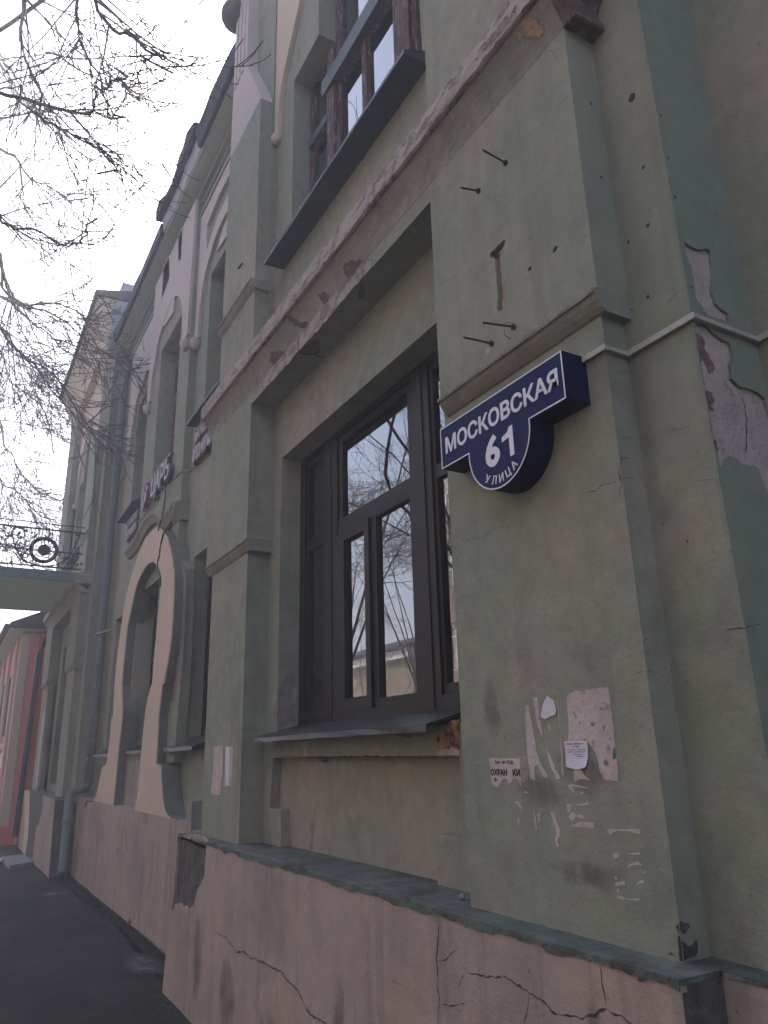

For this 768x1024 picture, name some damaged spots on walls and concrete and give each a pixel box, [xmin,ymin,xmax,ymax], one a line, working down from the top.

flaking render [685,246,768,492]
flaking render [175,834,209,909]
crack [214,930,326,1024]
crack [436,923,632,1024]
spalling [667,921,698,961]